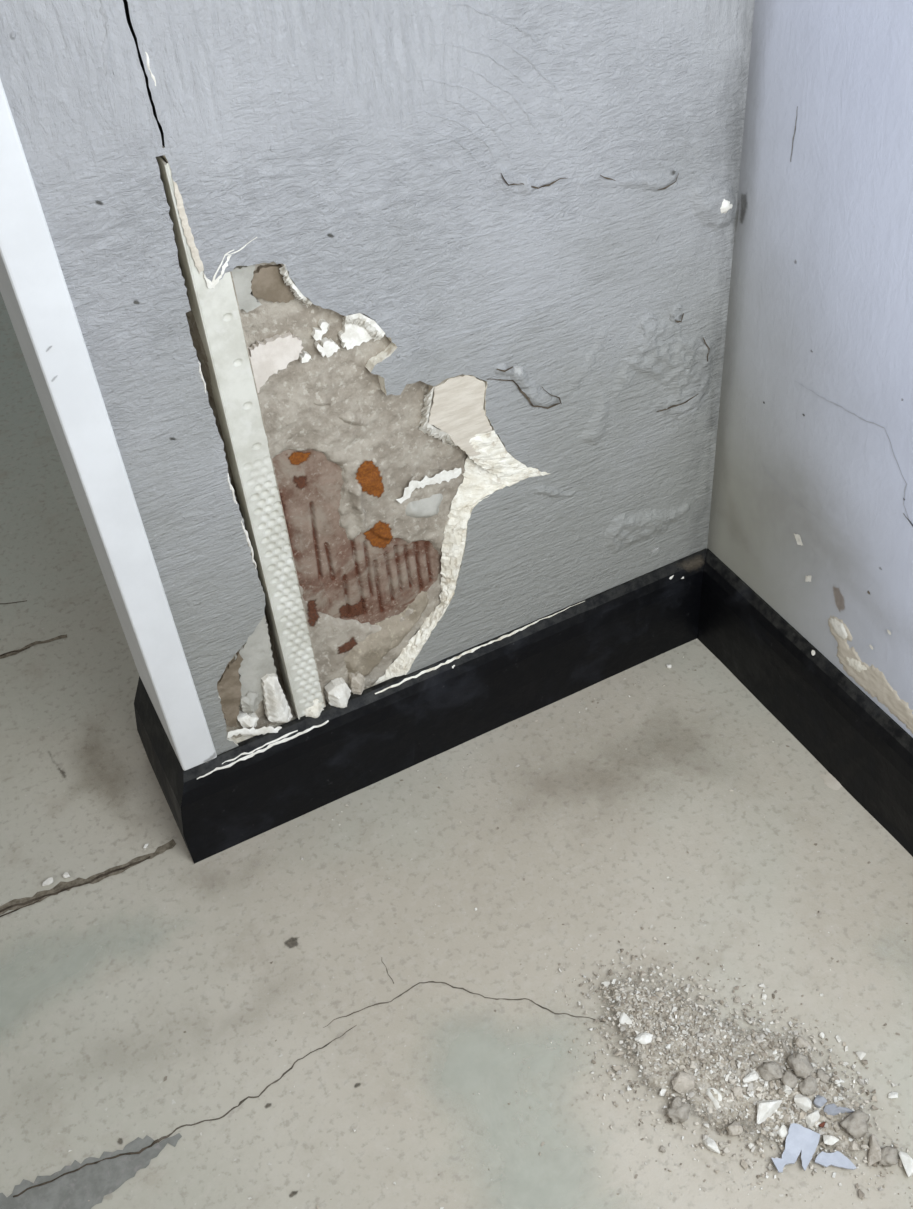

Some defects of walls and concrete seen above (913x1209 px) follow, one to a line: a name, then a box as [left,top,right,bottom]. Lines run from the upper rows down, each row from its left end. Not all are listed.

crack [99,0,165,147]
spalling [172,180,584,779]
crack [795,381,913,526]
crack [0,856,150,917]
crack [158,963,613,1143]